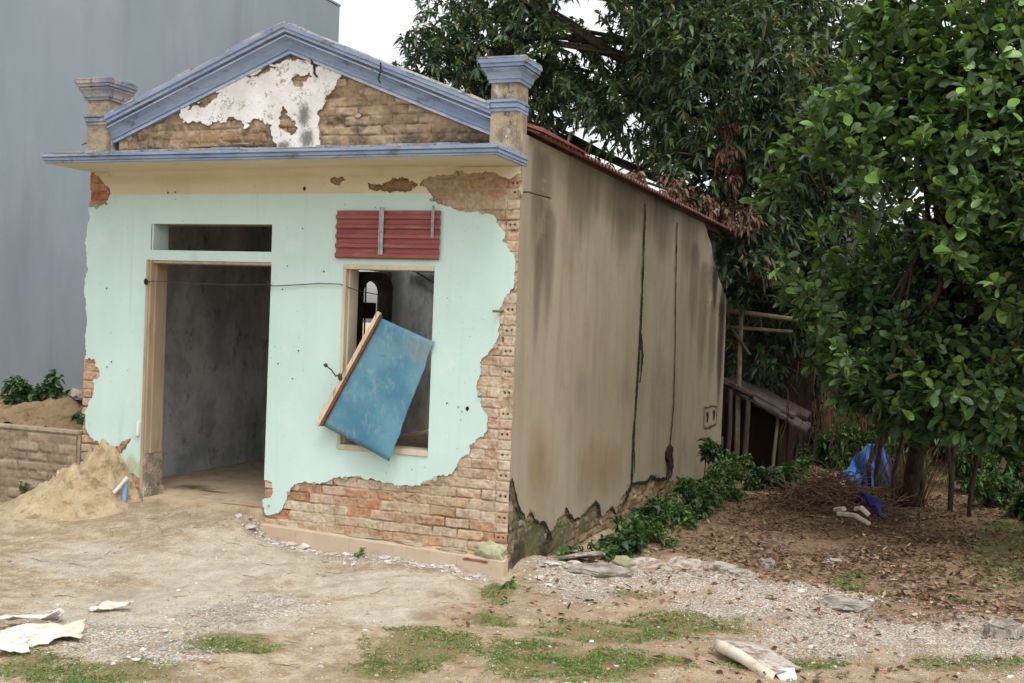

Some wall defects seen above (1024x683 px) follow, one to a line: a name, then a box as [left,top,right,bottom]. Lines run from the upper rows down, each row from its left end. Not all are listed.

spalling [119,55,490,151]
spalling [89,173,110,209]
spalling [80,355,130,464]
spalling [263,170,706,571]
crack [512,204,678,541]
leakage [712,265,724,387]
spalling [795,579,936,669]